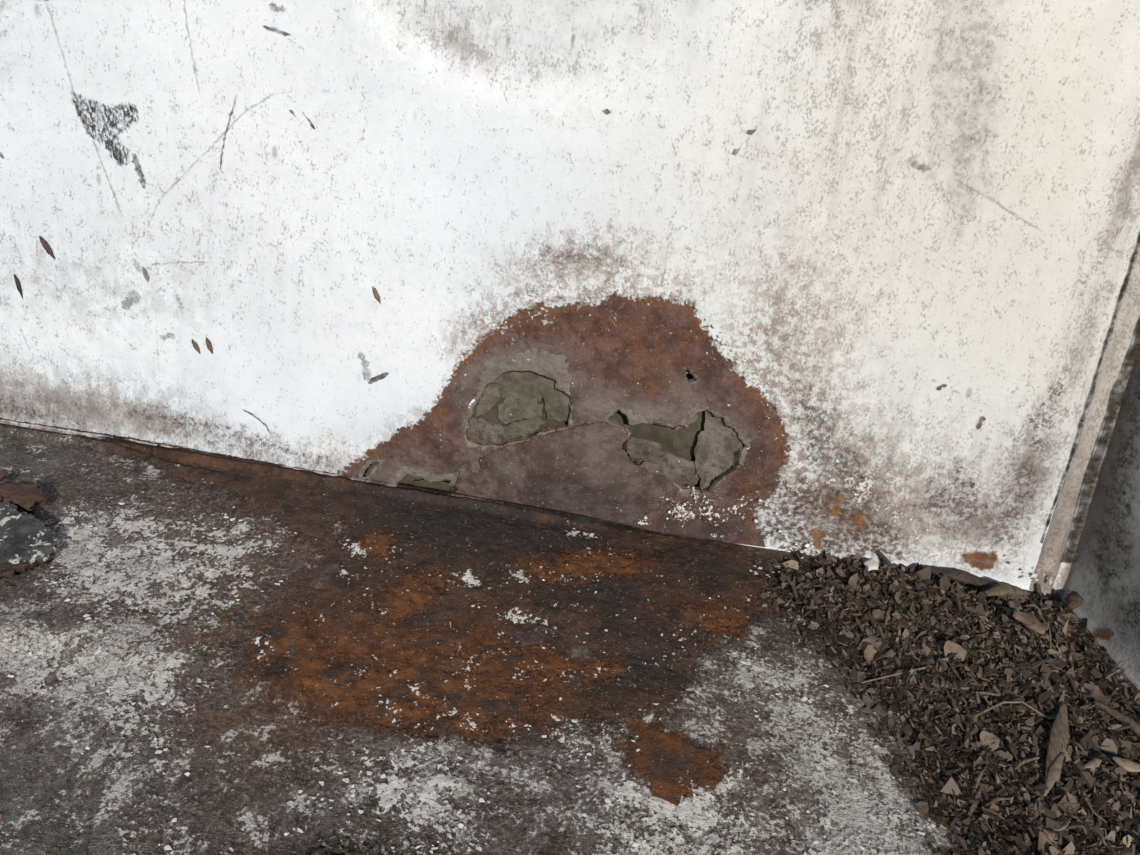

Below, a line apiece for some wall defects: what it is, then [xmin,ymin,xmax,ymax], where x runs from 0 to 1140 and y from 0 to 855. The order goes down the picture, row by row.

rust [75,290,822,816]
peeling [467,371,572,445]
peeling [626,410,742,521]
peeling [755,491,815,562]
rust [963,551,998,570]
mould [1092,375,1140,640]
peeling [0,491,297,855]
peeling [289,737,505,855]